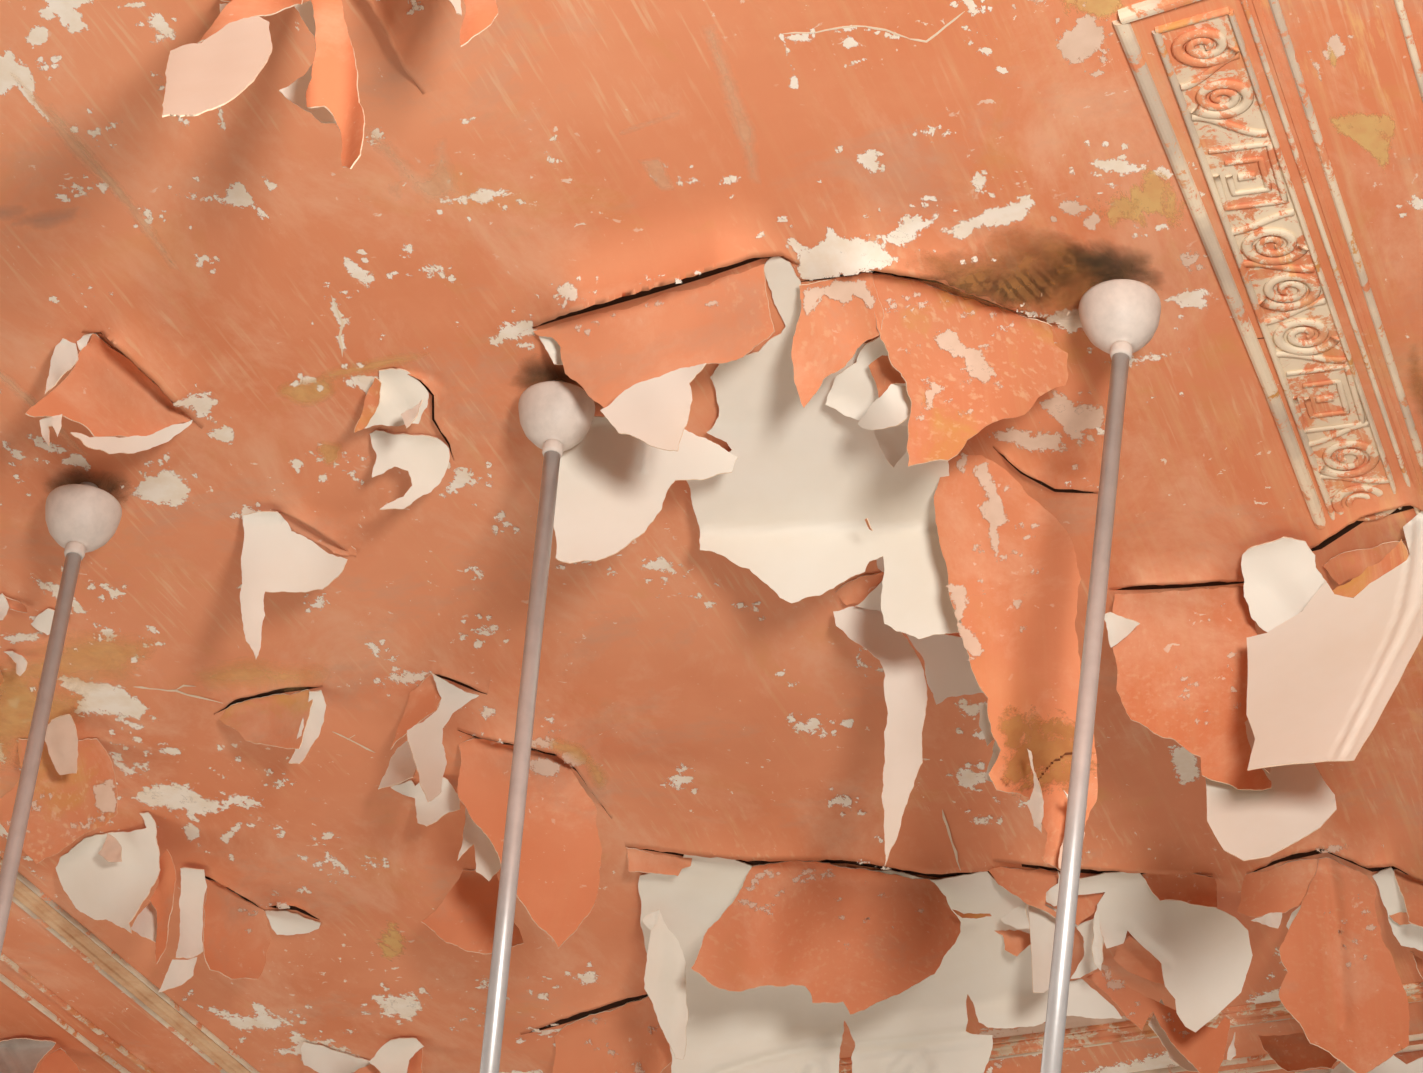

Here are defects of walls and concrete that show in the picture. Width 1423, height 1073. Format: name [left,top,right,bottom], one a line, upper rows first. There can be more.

peeling [118,0,385,169]
flaking render [835,146,885,174]
flaking render [1050,140,1174,230]
peeling [2,333,236,508]
peeling [289,244,493,510]
leakage [949,244,1087,306]
flaking render [1165,251,1224,330]
peeling [230,502,356,659]
peeling [489,170,1105,1073]
peeling [0,566,432,1073]
peeling [364,639,514,954]
peeling [1064,511,1423,1073]